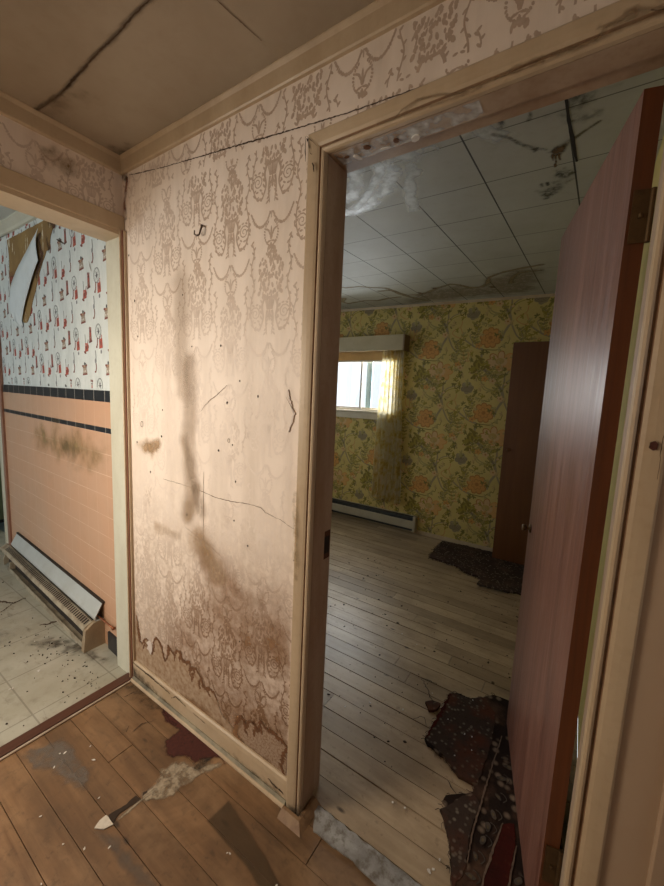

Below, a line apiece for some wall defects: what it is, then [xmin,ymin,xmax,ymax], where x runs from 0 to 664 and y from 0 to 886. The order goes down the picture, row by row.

crack [35,0,151,110]
water stain [396,5,664,117]
crack [130,86,420,175]
water stain [345,163,420,216]
water stain [542,120,601,199]
water stain [143,440,160,453]
water stain [195,533,285,664]
peeling [138,625,155,655]
water stain [162,700,220,769]